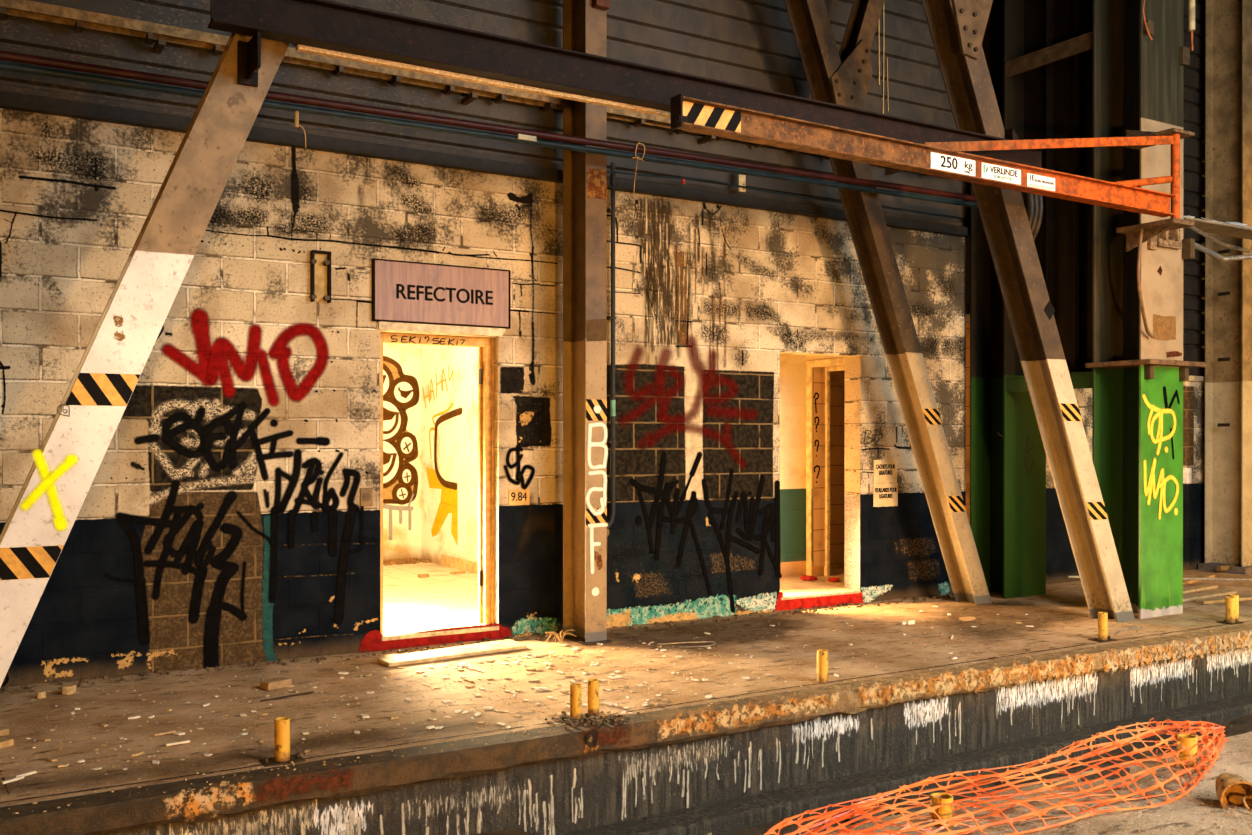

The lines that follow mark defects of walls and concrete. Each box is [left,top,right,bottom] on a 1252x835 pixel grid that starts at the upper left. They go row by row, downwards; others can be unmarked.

damp [291,147,300,241]
damp [519,204,537,385]
damp [633,198,715,355]
rust [859,630,1252,707]
rust [164,768,354,817]
damp [156,799,383,835]
damp [401,775,555,835]
damp [572,768,583,823]
damp [619,739,762,820]
damp [776,715,873,783]